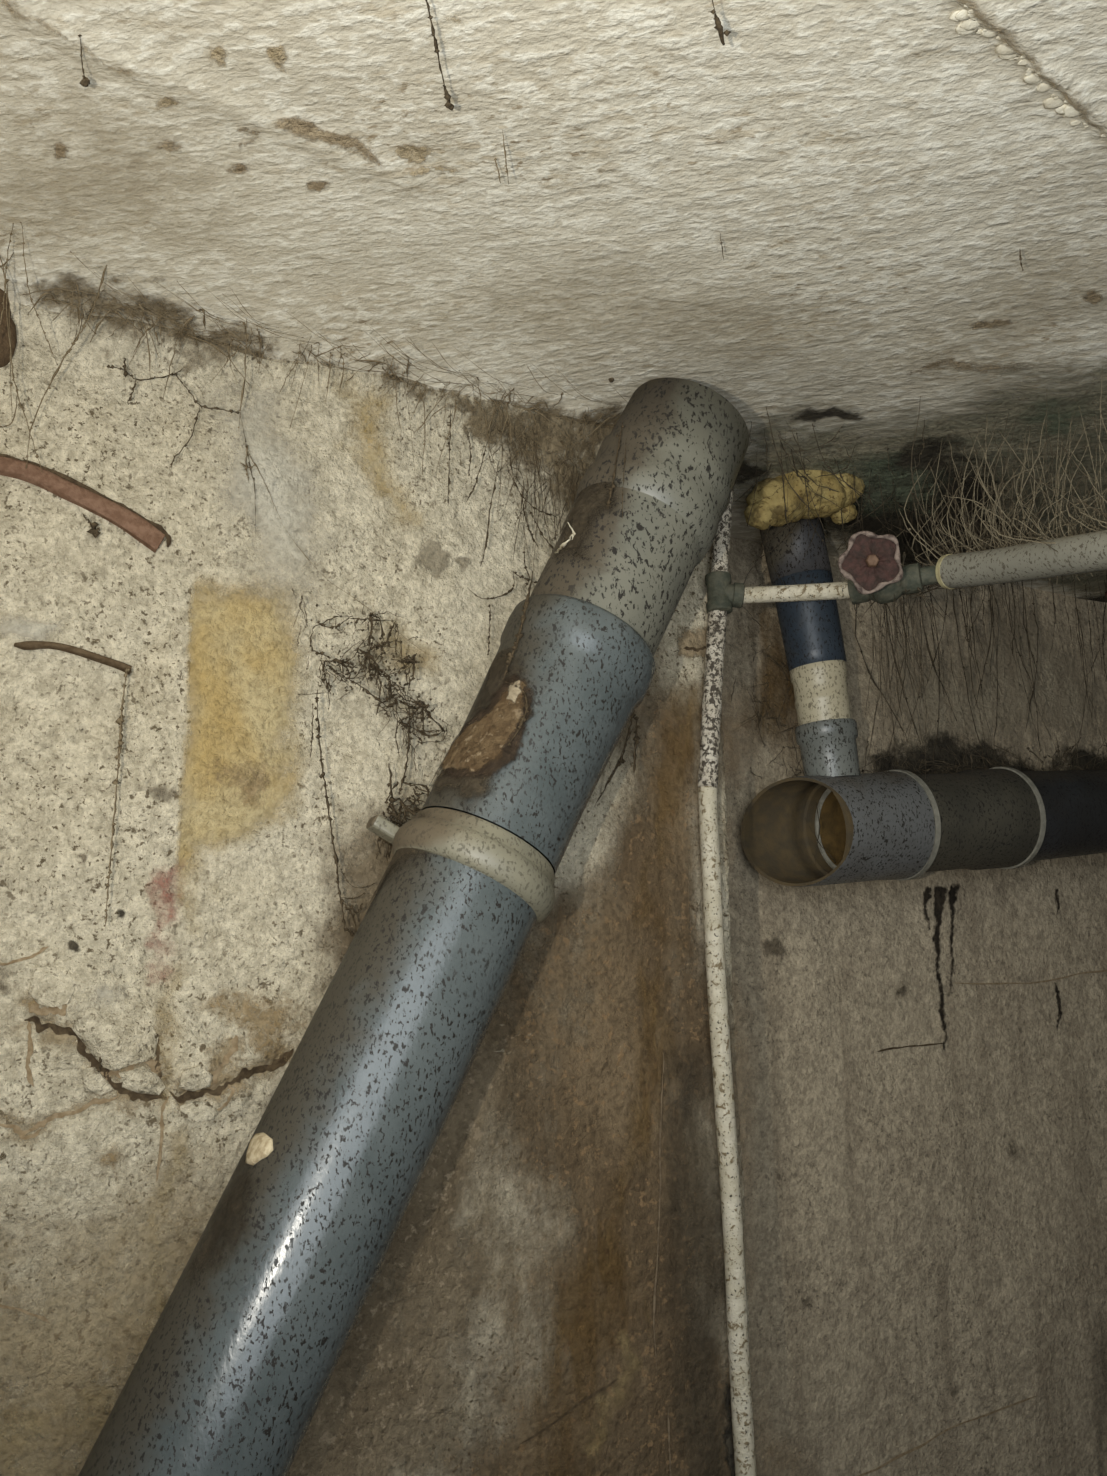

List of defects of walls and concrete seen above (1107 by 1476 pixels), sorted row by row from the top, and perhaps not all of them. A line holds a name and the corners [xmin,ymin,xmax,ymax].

water stain [25,277,273,371]
water stain [383,367,433,401]
rust [0,456,165,553]
water stain [451,390,622,511]
water stain [151,587,296,923]
water stain [923,884,960,1049]
crack [0,1001,294,1182]